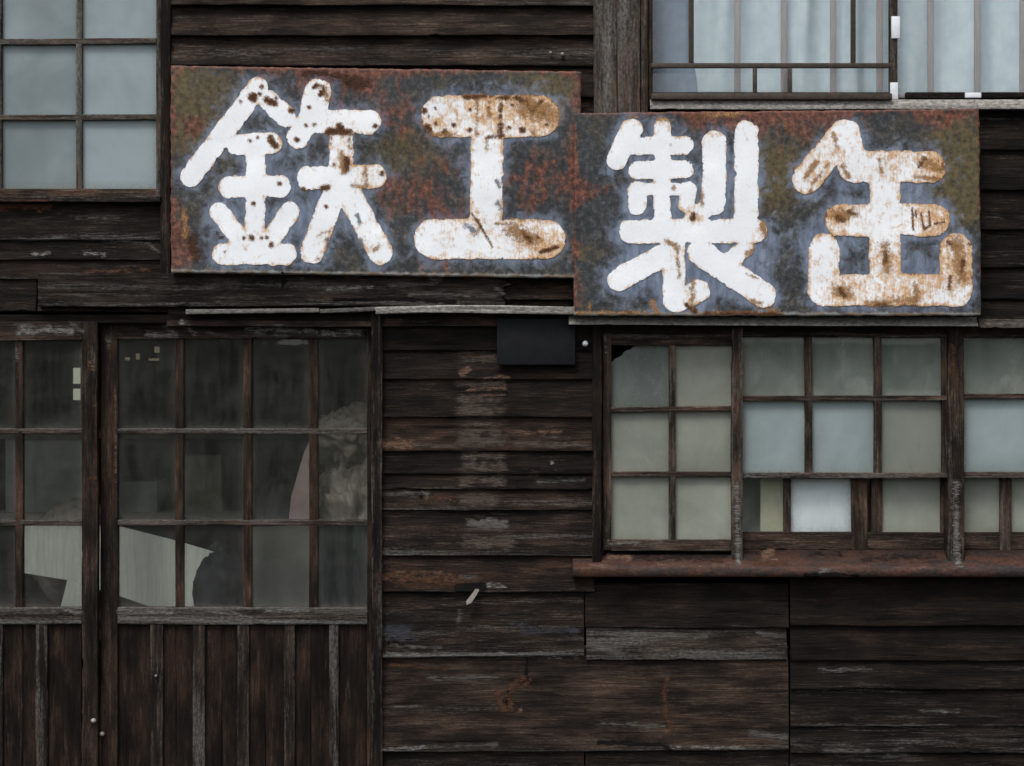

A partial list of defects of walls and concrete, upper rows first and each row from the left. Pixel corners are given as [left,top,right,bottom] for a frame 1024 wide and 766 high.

rust [239,84,312,113]
rust [302,70,372,105]
rust [420,93,563,149]
rust [249,135,279,149]
rust [304,122,384,189]
rust [802,160,851,193]
rust [831,207,859,223]
rust [495,219,560,254]
rust [664,239,783,318]
rust [831,281,854,299]
rust [877,241,893,274]
rust [946,234,972,290]